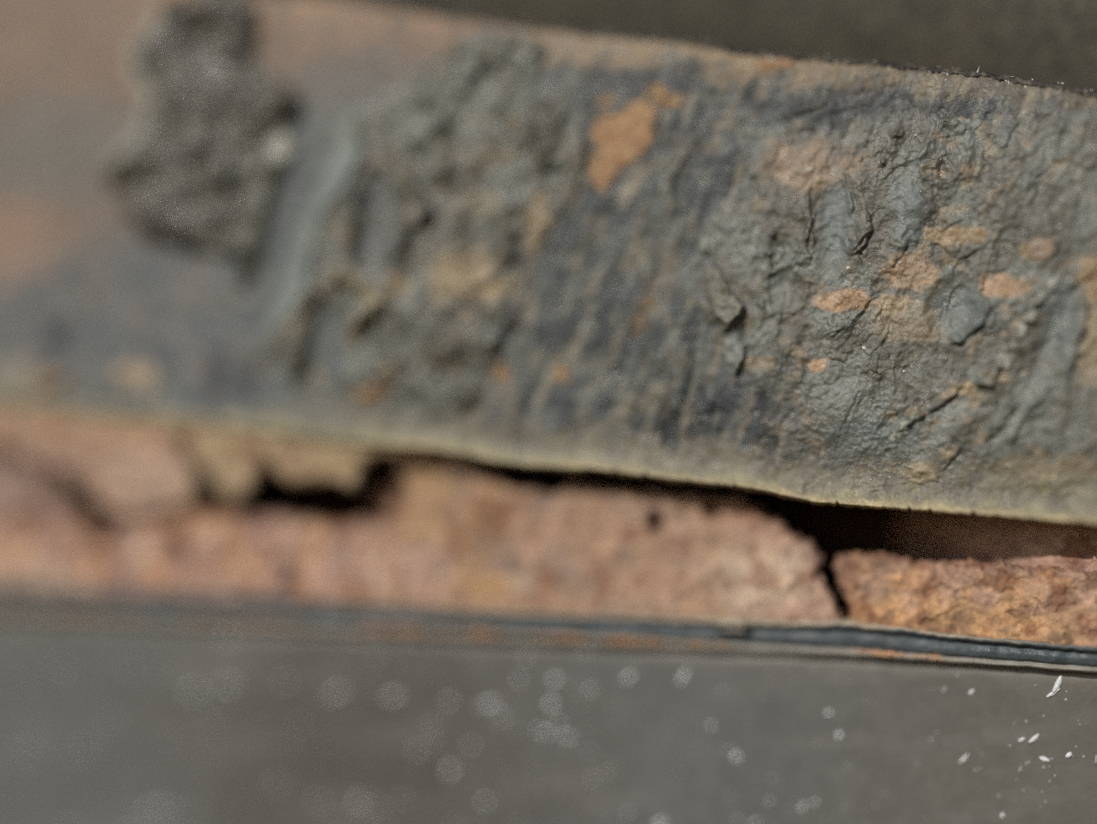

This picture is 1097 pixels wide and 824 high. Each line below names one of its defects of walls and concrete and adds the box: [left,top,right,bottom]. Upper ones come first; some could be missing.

corrosion [588,84,688,193]
peeling [672,97,1097,501]
corrosion [0,401,1097,647]
corrosion [859,650,937,660]